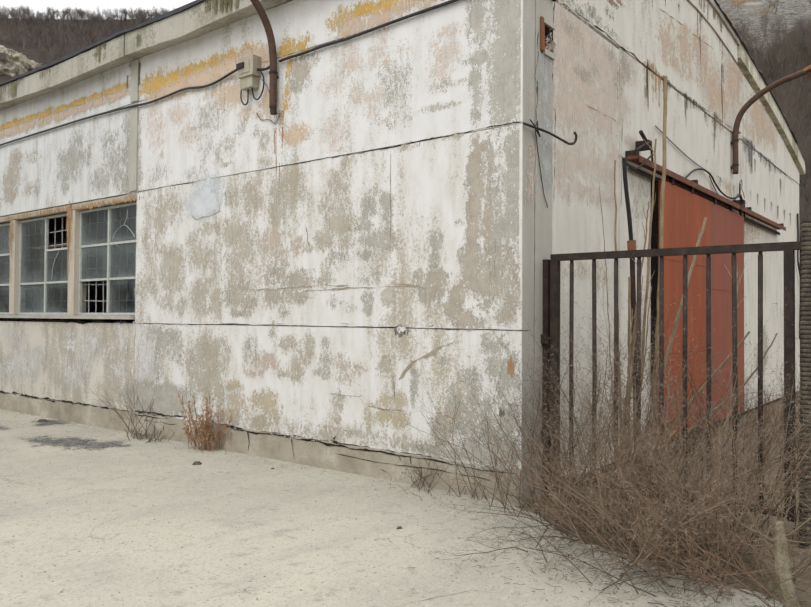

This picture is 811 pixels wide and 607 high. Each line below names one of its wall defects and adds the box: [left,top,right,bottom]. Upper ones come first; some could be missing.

water stain [204,0,239,14]
water stain [697,0,723,60]
water stain [662,65,724,152]
water stain [741,135,782,189]
peeling [0,0,647,485]
crack [0,391,108,409]
crack [135,410,186,428]
crack [211,421,514,481]